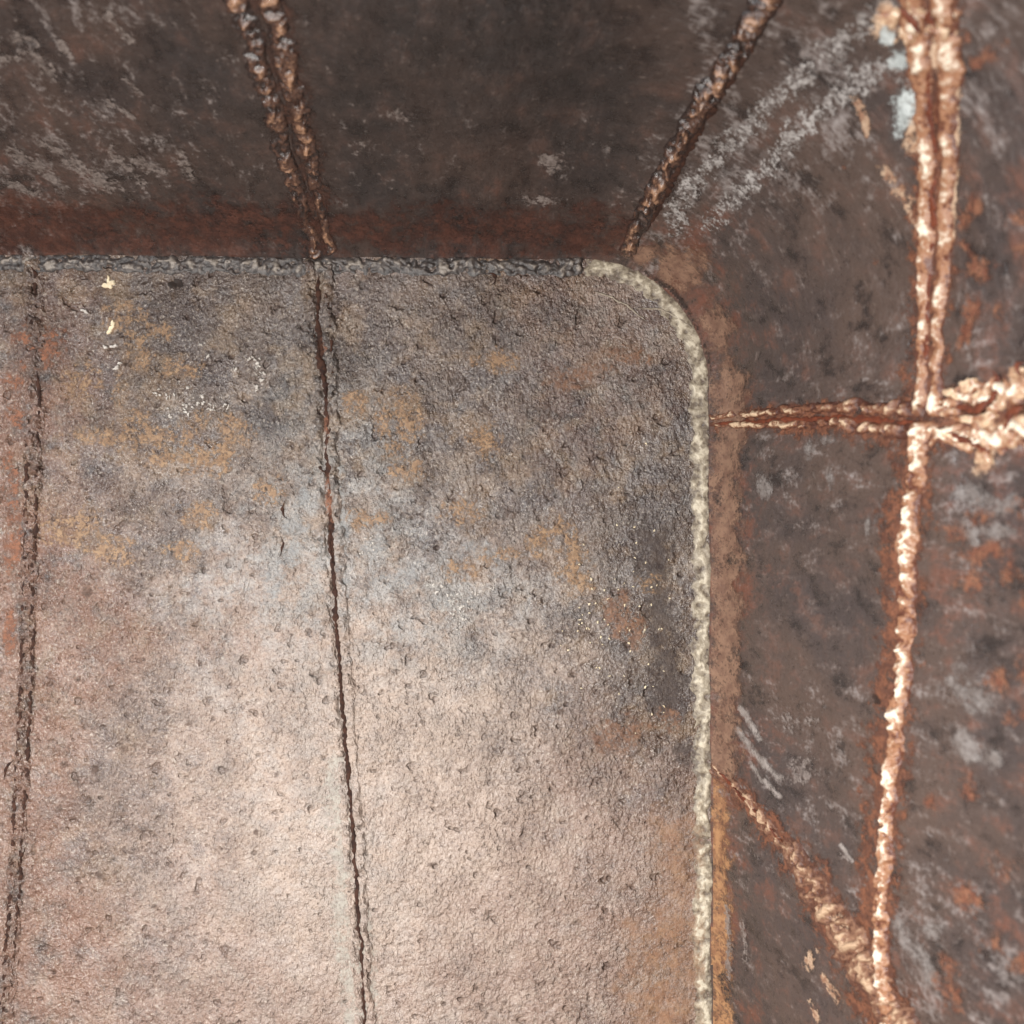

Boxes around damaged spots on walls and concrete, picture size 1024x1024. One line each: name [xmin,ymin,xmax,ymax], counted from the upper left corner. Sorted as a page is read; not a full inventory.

crack [18,266,38,326]
crack [646,27,764,231]
water stain [663,0,902,237]
crack [899,5,955,43]
crack [922,71,938,384]
crack [715,414,914,425]
crack [948,361,1024,455]
crack [0,371,42,1024]
crack [313,276,367,1024]
crack [714,769,783,842]